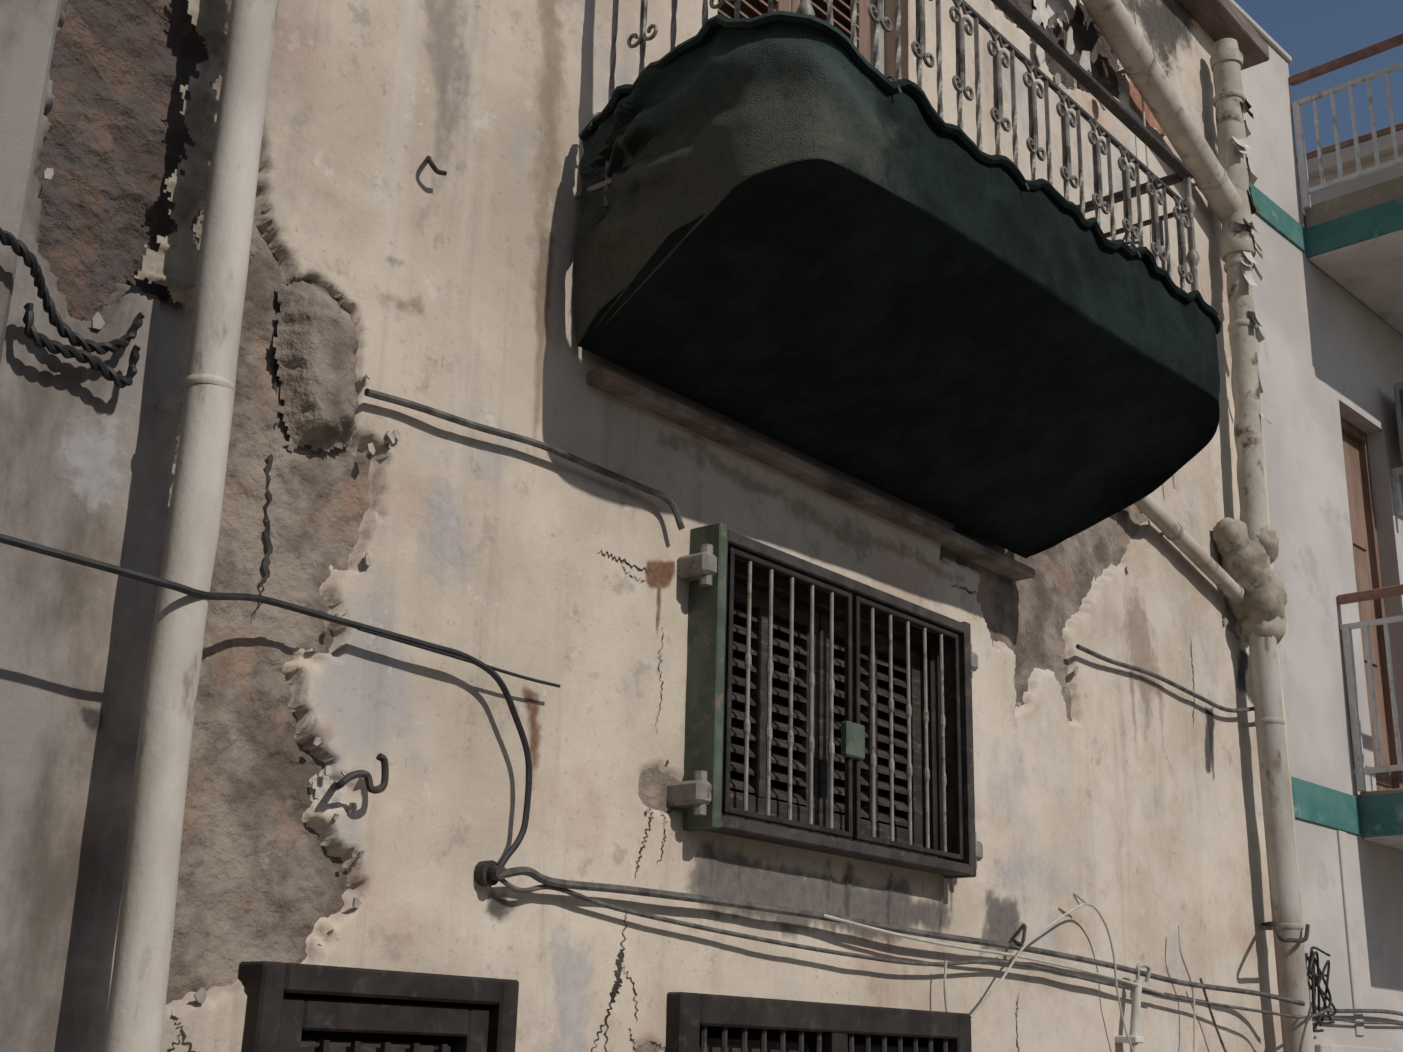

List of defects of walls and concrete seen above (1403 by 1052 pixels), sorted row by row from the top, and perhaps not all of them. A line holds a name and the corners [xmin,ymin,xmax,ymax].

crack [253,277,295,620]
spalling [166,221,400,1005]
corrosion [646,561,675,627]
spalling [939,504,1150,721]
crack [635,811,666,876]
leakage [693,846,947,937]
crack [168,1011,196,1052]
crack [592,914,666,1052]